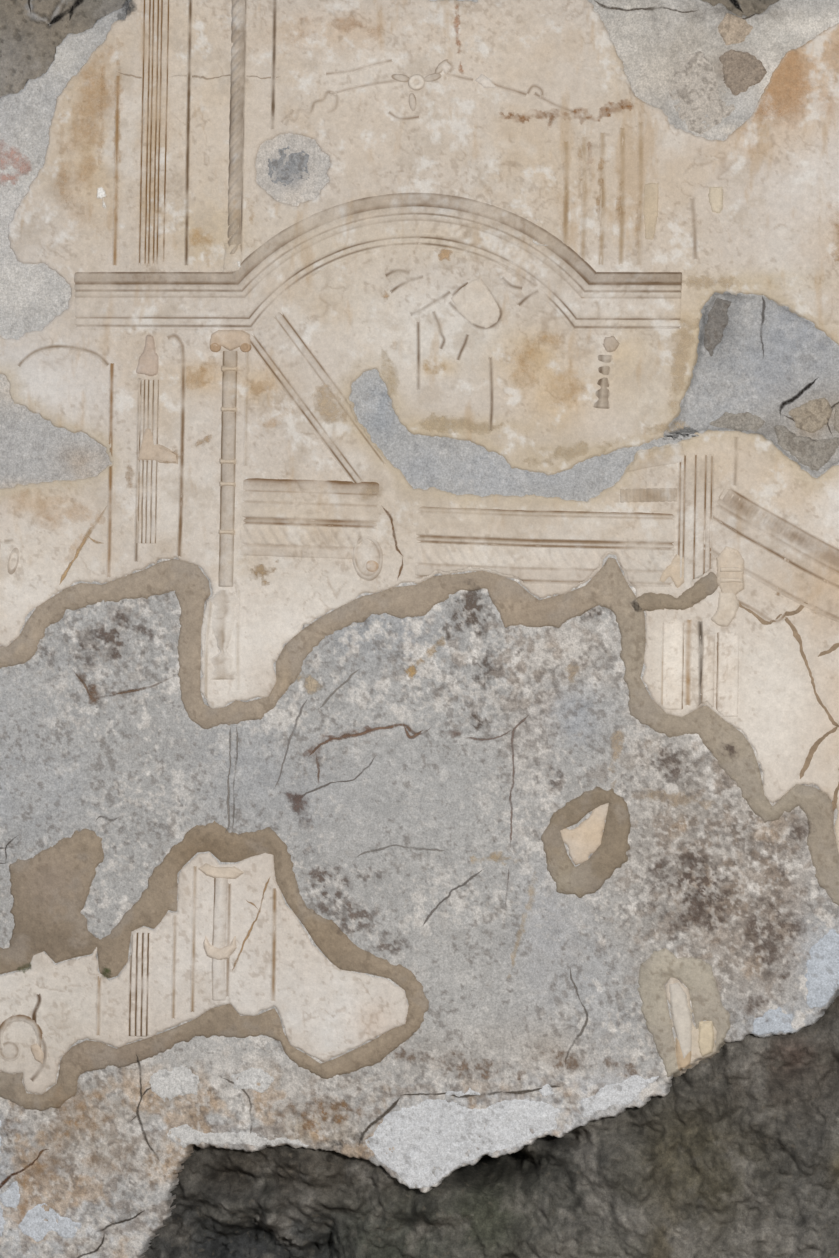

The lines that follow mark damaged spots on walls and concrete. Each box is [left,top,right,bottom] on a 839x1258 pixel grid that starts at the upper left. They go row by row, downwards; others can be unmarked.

crack [28,0,83,25]
crack [595,1,697,13]
spalling [588,0,839,141]
crack [730,0,759,19]
spalling [0,374,112,489]
spalling [349,291,839,502]
crack [275,670,423,796]
crack [739,602,839,812]
spalling [0,588,839,1258]